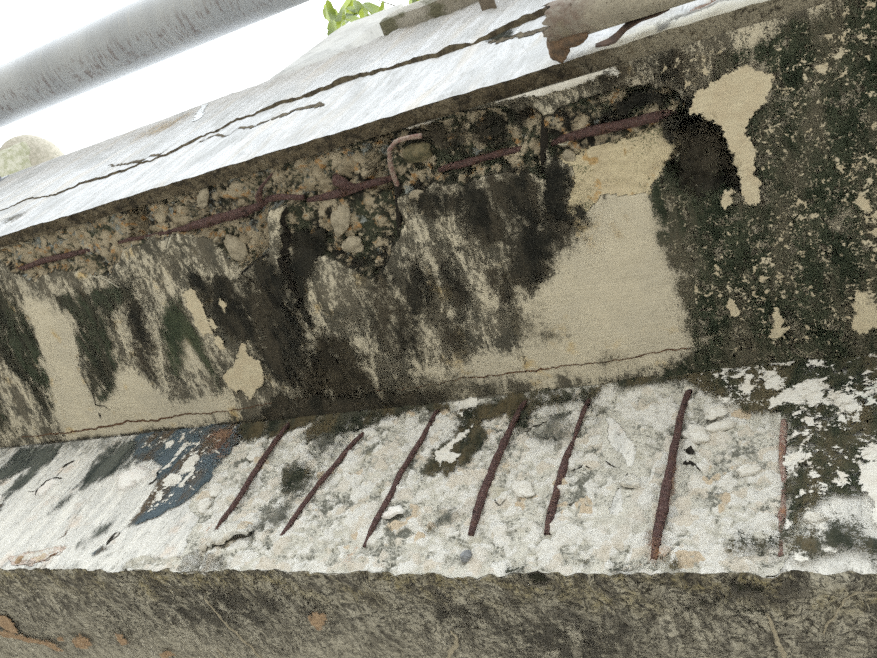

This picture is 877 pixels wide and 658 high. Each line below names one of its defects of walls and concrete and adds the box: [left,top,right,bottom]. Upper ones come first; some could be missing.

crack [0,8,549,211]
spalling [0,0,877,350]
damp [413,99,542,161]
damp [398,149,594,347]
damp [582,0,877,399]
peeling [223,343,266,400]
damp [0,226,609,534]
corrosion [346,409,441,559]
corrosion [468,399,528,536]
spalling [122,353,877,579]
corrosion [544,397,591,536]
corrosion [646,389,693,560]